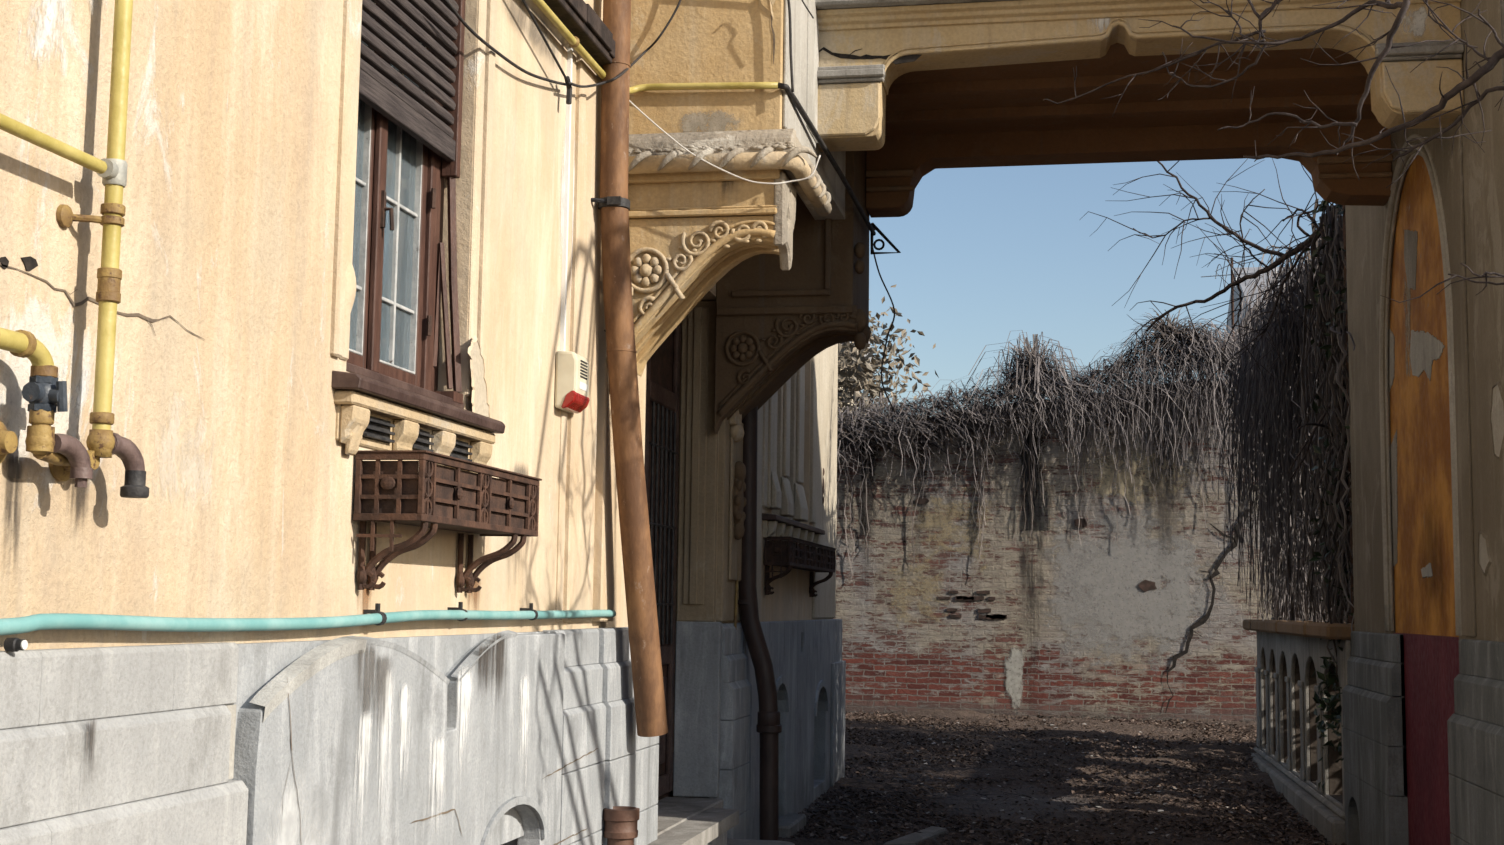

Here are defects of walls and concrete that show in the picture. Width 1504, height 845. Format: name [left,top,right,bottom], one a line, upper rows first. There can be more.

crack [0,263,205,340]
peeling [1389,230,1445,392]
flaking render [468,335,490,418]
water stain [6,457,22,535]
water stain [72,485,87,517]
water stain [859,430,880,556]
water stain [1020,396,1042,618]
spalling [938,590,1007,620]
water stain [359,648,408,802]
water stain [432,635,505,807]
water stain [520,677,529,752]